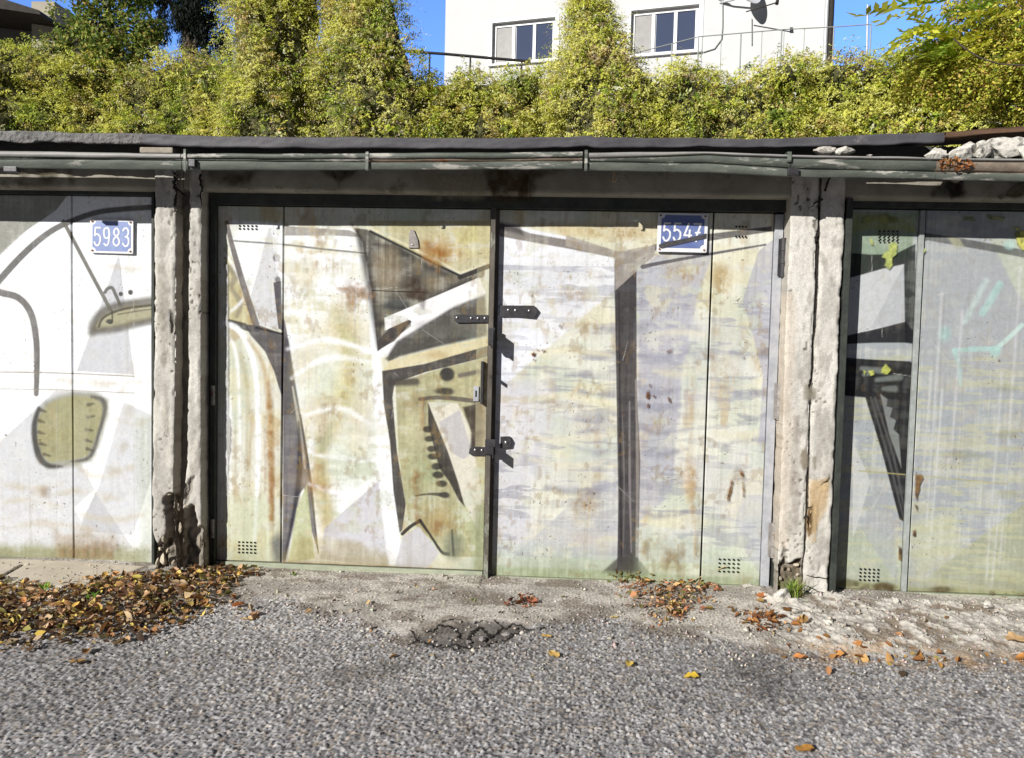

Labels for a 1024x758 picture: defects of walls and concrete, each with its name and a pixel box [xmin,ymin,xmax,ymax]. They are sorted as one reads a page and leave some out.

spalling [155,493,201,567]
crack [801,178,831,594]